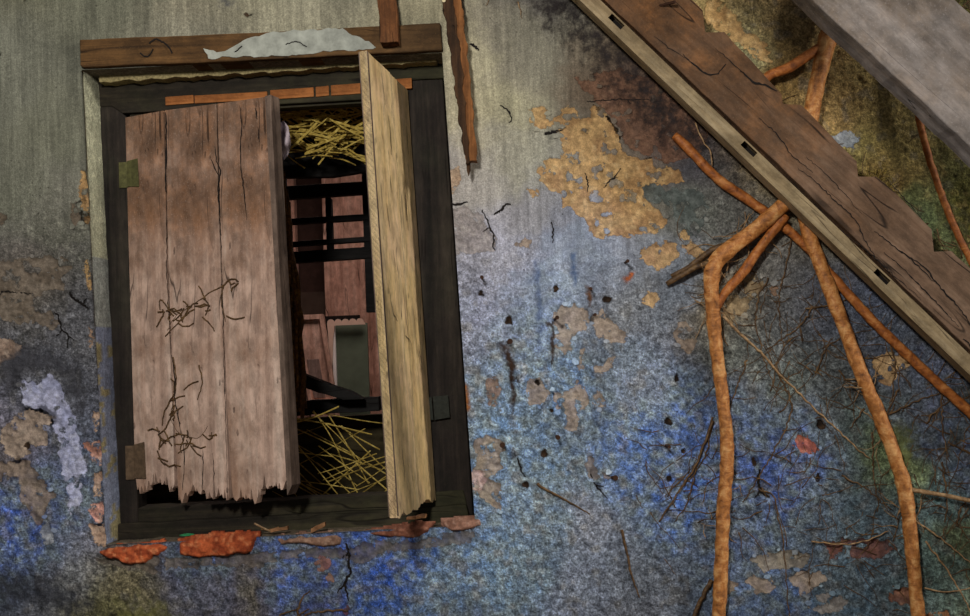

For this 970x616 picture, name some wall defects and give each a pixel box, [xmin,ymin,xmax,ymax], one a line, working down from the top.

flaking render [77,170,90,226]
flaking render [526,67,709,271]
flaking render [0,338,22,366]
flaking render [485,376,504,413]
flaking render [526,296,626,432]
flaking render [0,409,58,545]
flaking render [83,411,481,582]
flaking render [471,434,506,514]
flaking render [584,456,612,481]
crack [337,543,352,601]